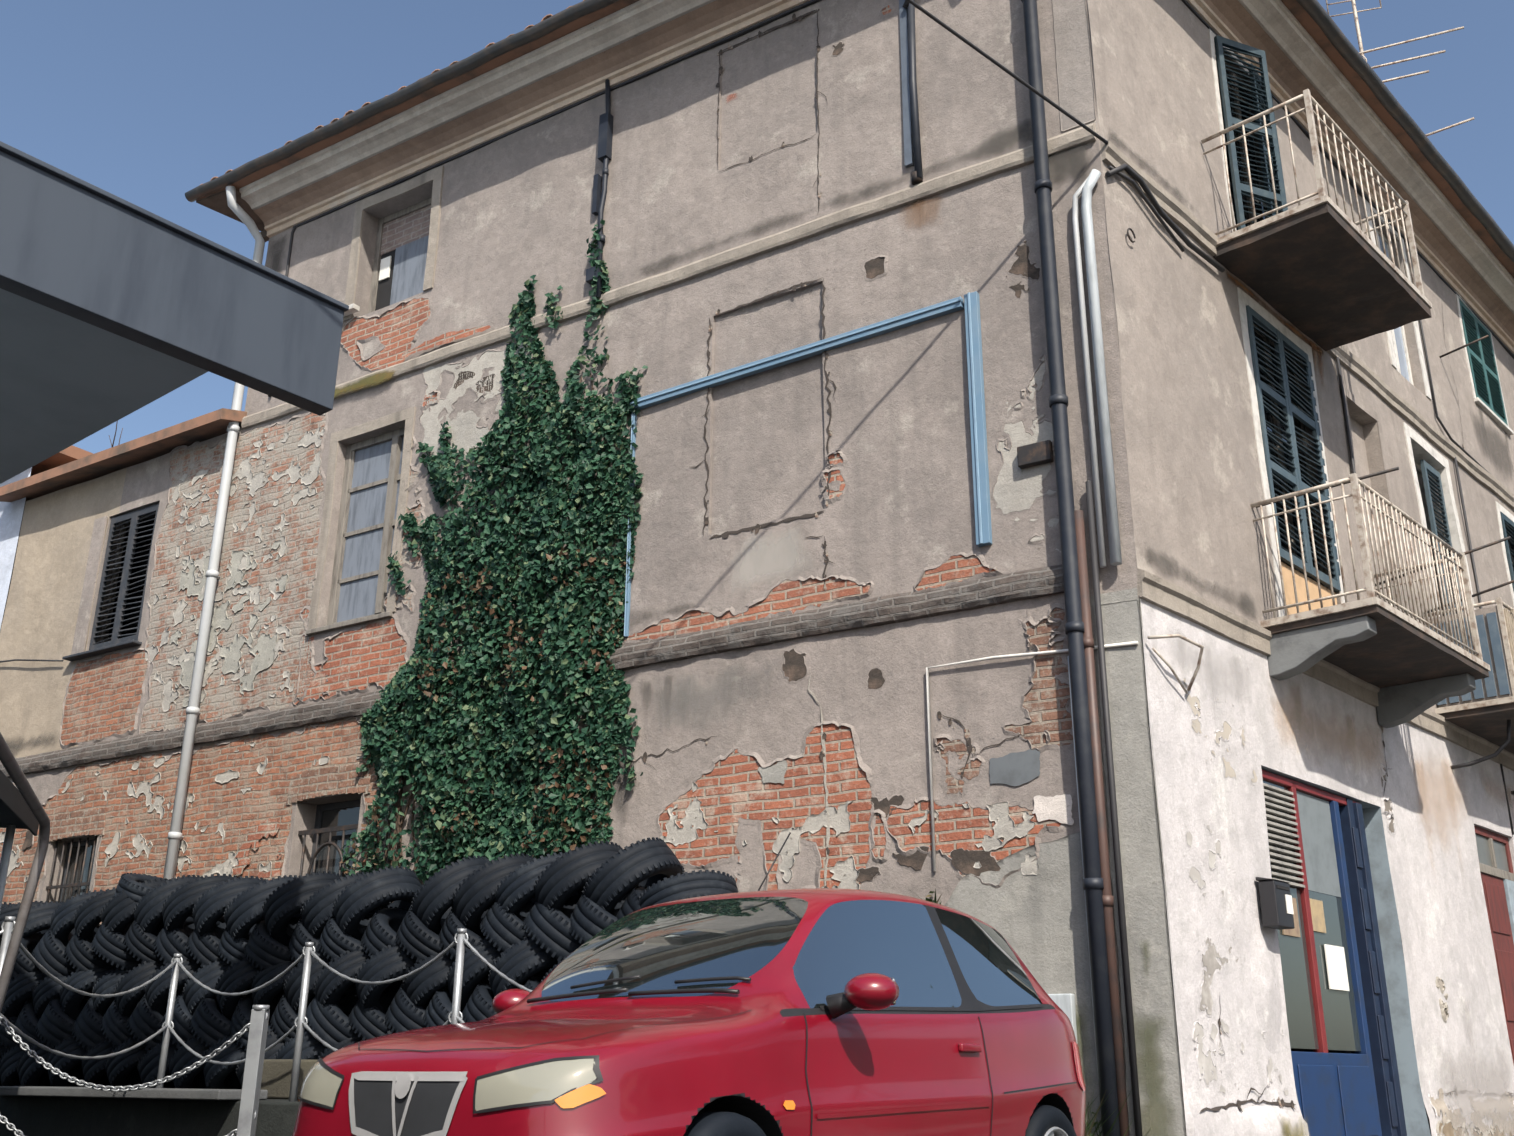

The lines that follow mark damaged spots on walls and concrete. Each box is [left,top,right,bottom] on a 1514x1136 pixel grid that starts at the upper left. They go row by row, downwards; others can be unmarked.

crack [716,9,828,212]
spalling [1004,240,1042,300]
spalling [59,295,542,749]
spalling [614,575,874,647]
crack [693,277,837,591]
spalling [781,648,808,683]
spalling [913,550,1003,592]
peeling [991,354,1062,555]
spalling [1002,603,1074,754]
spalling [0,711,397,904]
spalling [650,720,1066,891]
crack [1200,1085,1296,1112]